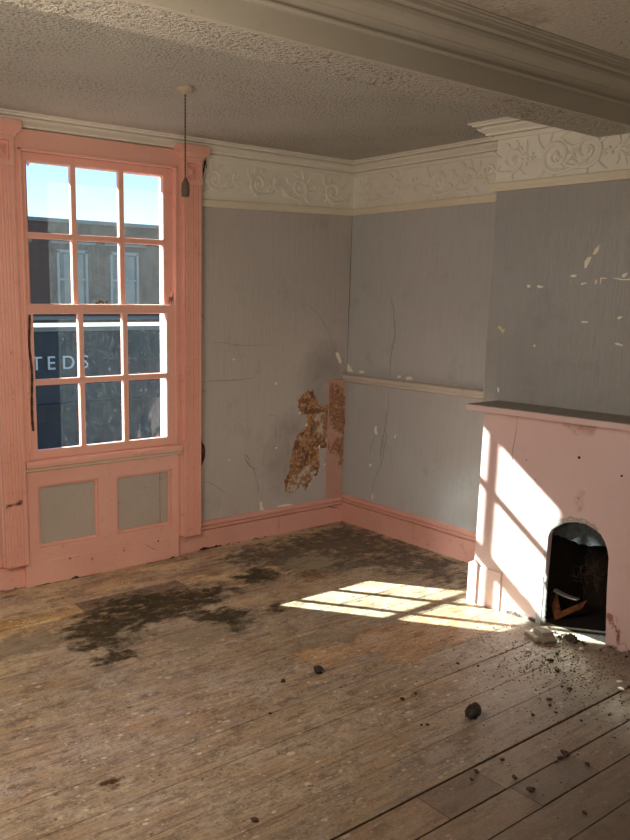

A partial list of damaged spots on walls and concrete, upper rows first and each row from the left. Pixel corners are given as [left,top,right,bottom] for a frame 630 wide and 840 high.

peeling [284,389,329,494]